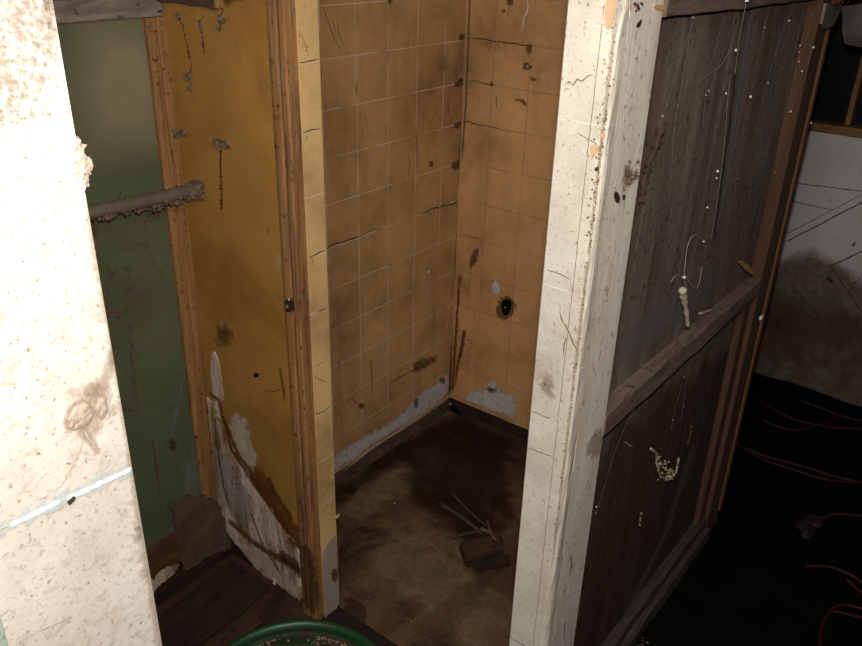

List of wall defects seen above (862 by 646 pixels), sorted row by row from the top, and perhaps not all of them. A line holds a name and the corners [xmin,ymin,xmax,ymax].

crack [420,201,482,246]
leakage [452,0,470,168]
crack [474,38,531,51]
peeling [584,27,615,268]
peeling [150,562,180,593]
peeling [207,351,302,600]
corrosion [248,466,299,547]
leakage [334,263,460,471]
leakage [466,381,516,418]
peeling [559,279,586,493]